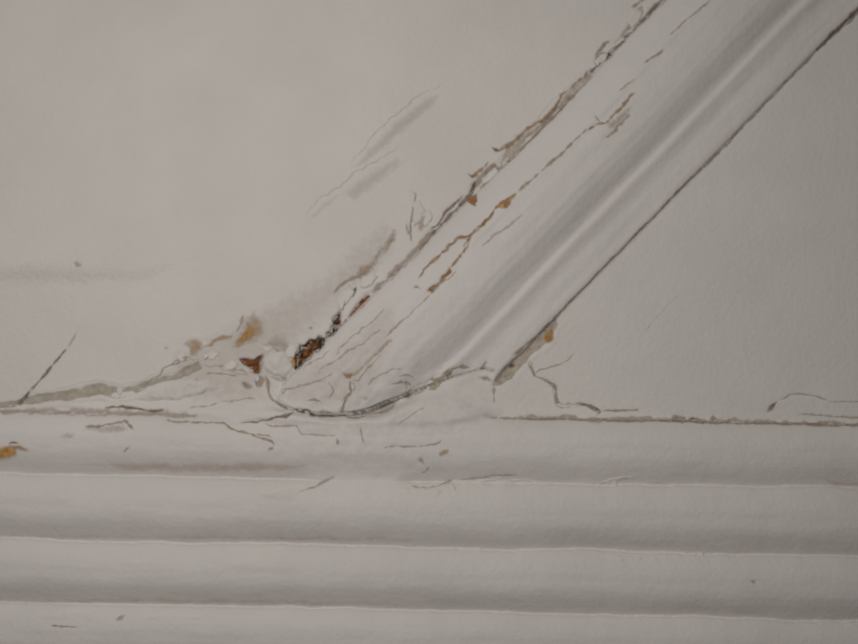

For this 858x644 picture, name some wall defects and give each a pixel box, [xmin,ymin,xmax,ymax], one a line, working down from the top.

spalling [467,0,643,206]
crack [559,1,858,315]
crack [0,0,663,450]
peeling [415,194,515,291]
spalling [0,272,378,413]
spalling [379,361,468,412]
spalling [481,316,560,401]
crack [489,356,858,426]
rust [0,442,23,458]